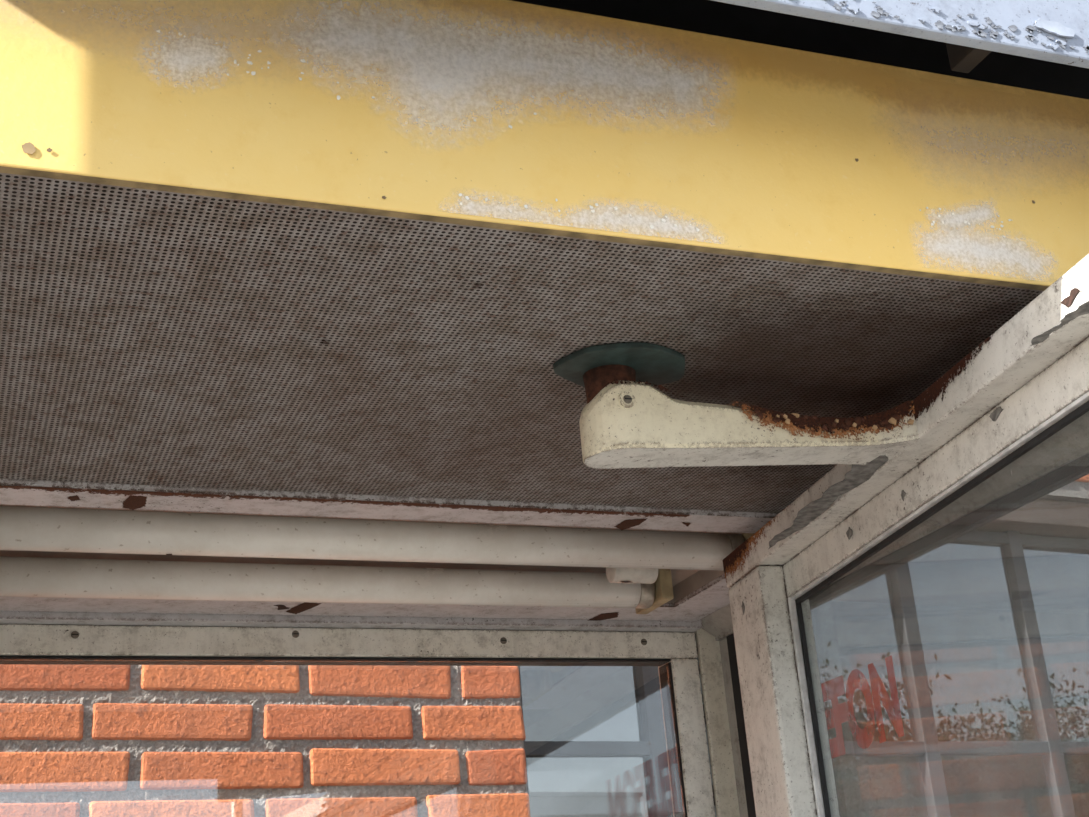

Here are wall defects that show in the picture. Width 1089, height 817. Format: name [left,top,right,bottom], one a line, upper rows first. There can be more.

peeling [833,1,900,19]
peeling [918,6,1089,53]
peeling [1030,288,1089,346]
rust [701,308,1006,441]
rust [0,485,690,518]
peeling [769,455,889,548]
rust [722,504,793,583]